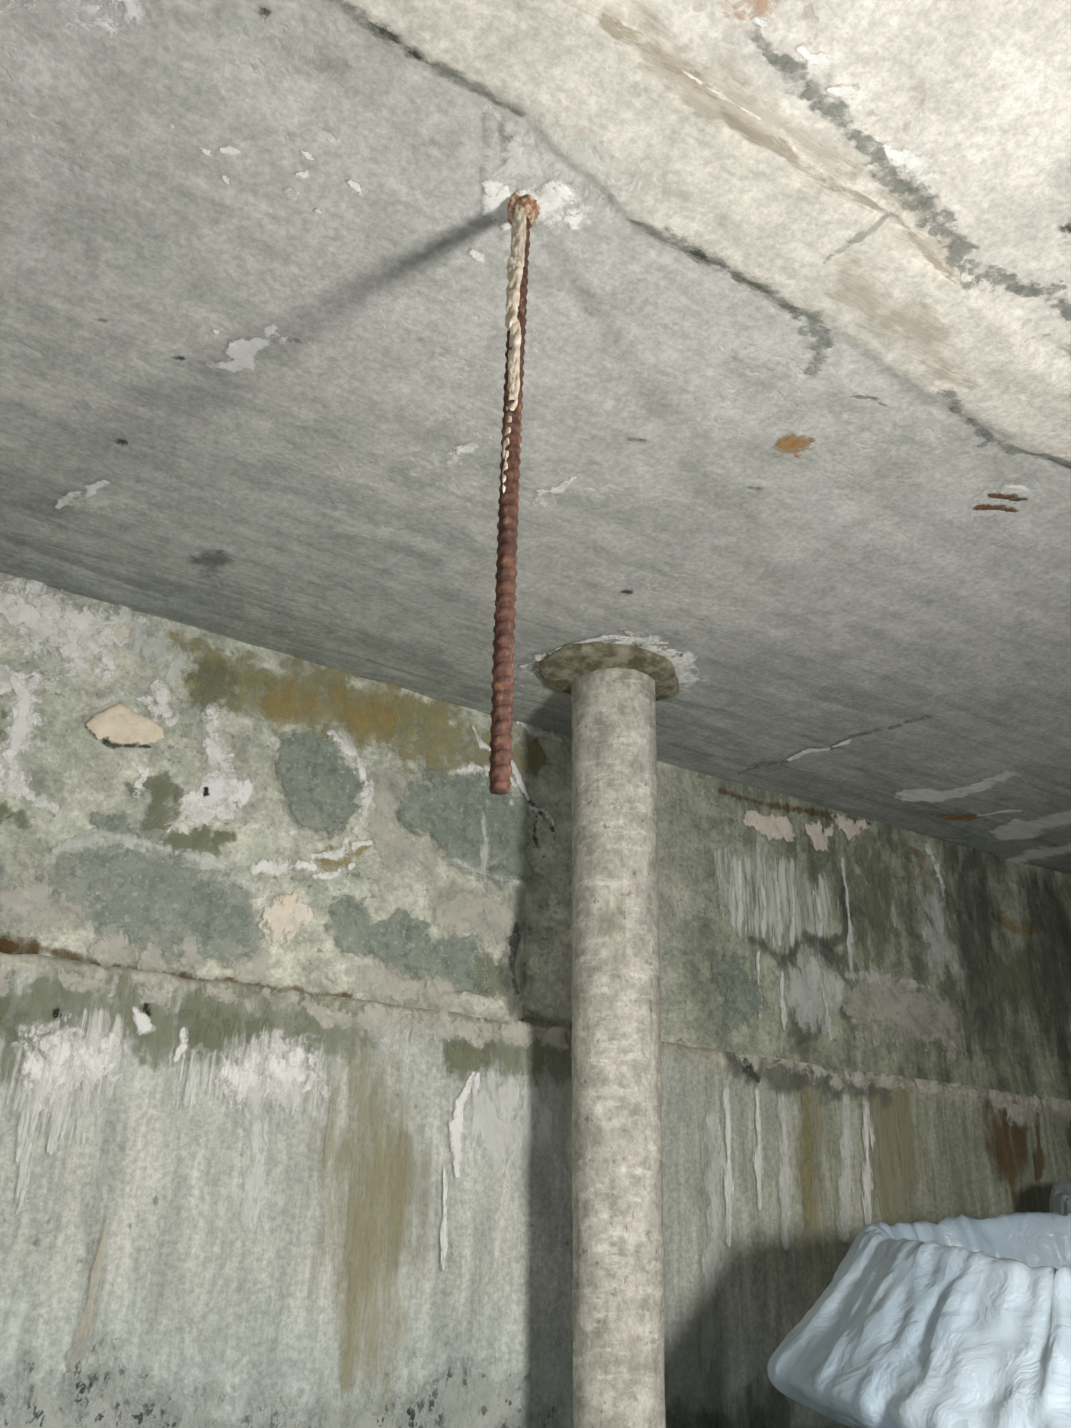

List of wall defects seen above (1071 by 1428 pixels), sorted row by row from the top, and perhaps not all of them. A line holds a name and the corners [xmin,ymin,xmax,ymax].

corrosion [727,0,770,20]
crack [753,29,1071,321]
crack [631,221,834,376]
spalling [274,180,579,890]
corrosion [773,434,816,458]
crack [938,390,1071,469]
spalling [86,703,165,749]
peeling [719,788,871,852]
peeling [36,811,568,1051]
damp [173,1027,425,1391]
damp [699,1085,735,1374]
damp [738,1054,1071,1251]